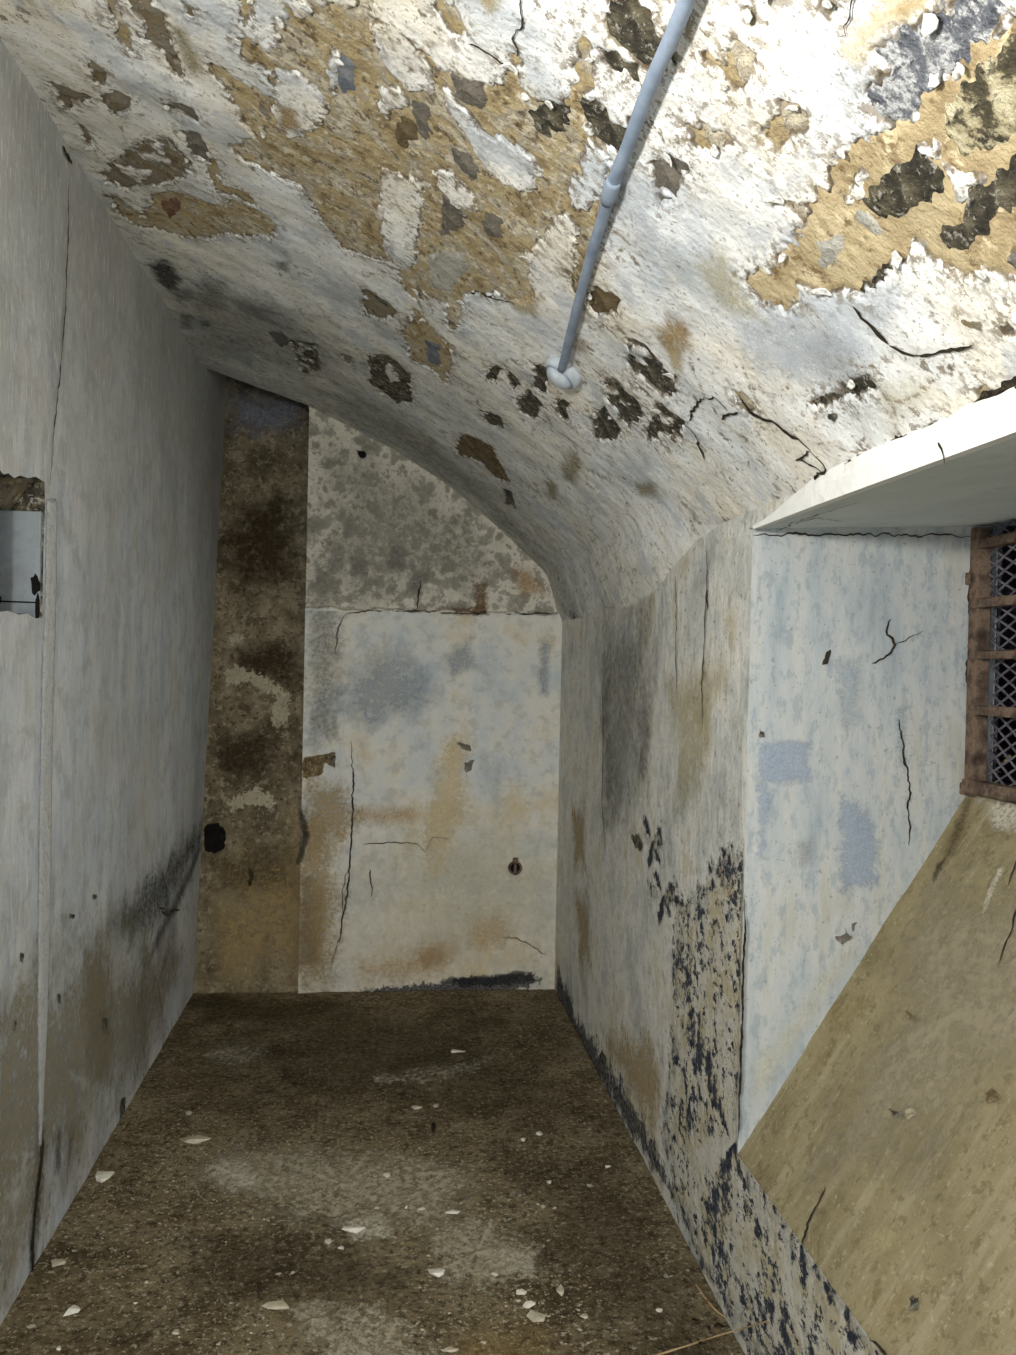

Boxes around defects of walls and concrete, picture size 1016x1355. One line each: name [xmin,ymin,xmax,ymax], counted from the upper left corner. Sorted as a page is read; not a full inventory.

crack [469,0,523,64]
spalling [206,0,662,406]
spalling [746,0,1016,311]
crack [852,306,972,357]
peeling [591,340,685,441]
crack [685,395,907,480]
crack [974,376,1016,403]
spalling [0,471,45,619]
leakage [225,500,290,590]
leakage [230,645,295,683]
leakage [213,780,359,1018]
leakage [821,799,1016,1167]